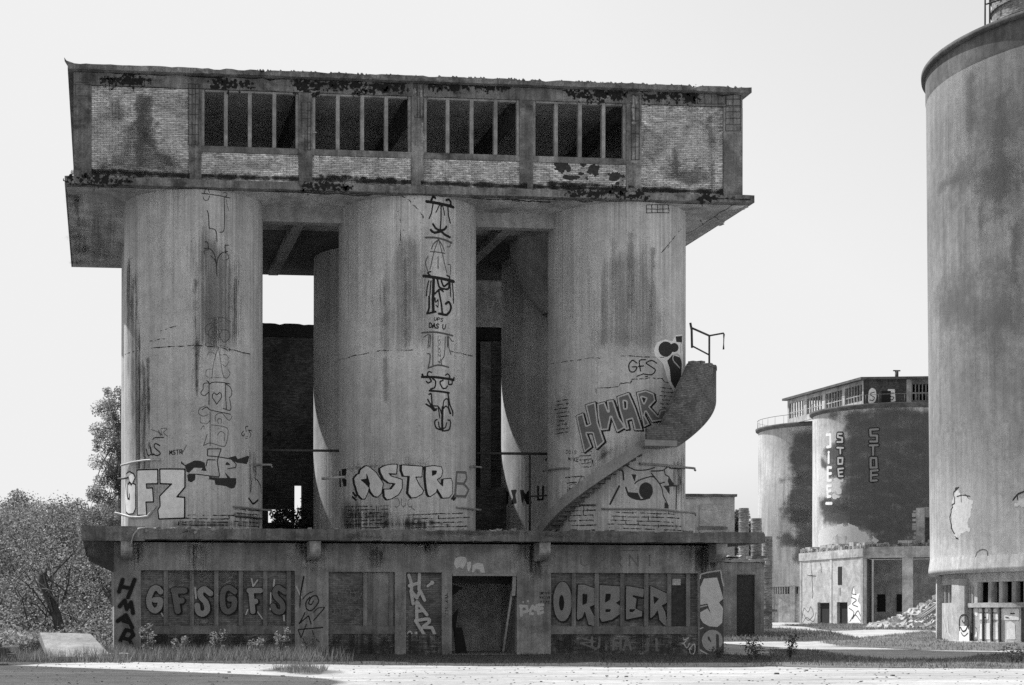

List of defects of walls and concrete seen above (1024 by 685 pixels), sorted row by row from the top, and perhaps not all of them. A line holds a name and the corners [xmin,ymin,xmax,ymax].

water stain [91,96,299,181]
water stain [312,156,723,194]
water stain [132,335,150,469]
water stain [781,407,929,562]
peeling [951,489,973,539]